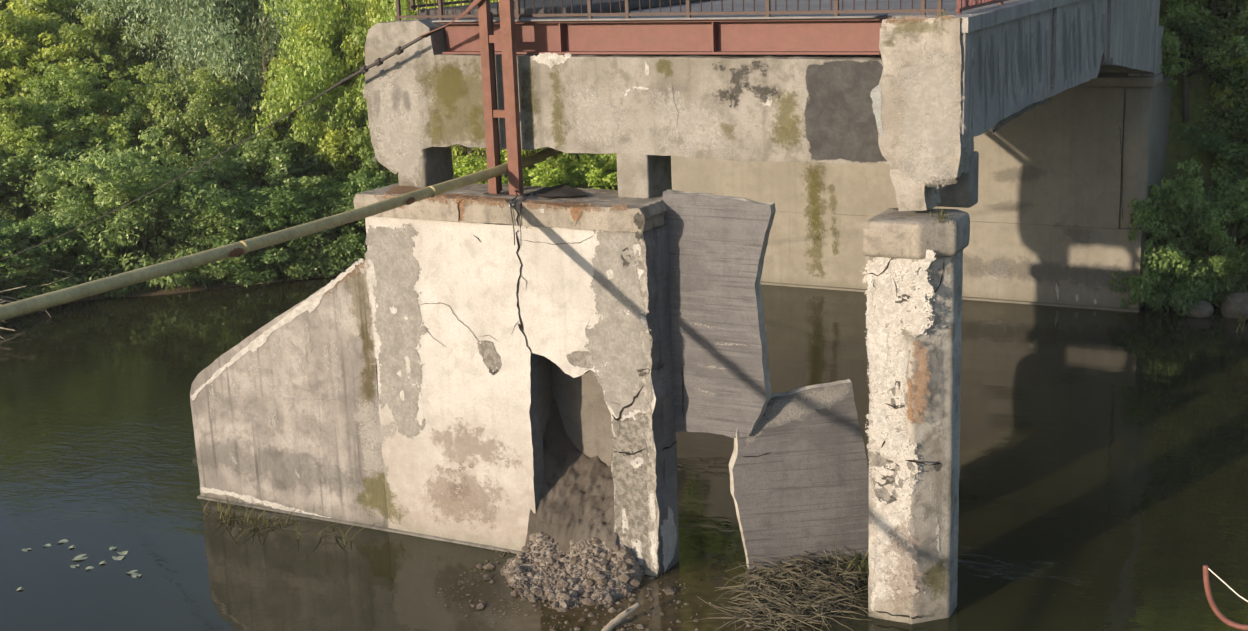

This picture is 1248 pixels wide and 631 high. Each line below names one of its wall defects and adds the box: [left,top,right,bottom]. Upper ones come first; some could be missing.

peeling [191,224,428,438]
crack [421,200,592,355]
peeling [566,212,677,572]
crack [612,372,684,455]
damp [810,171,819,243]
peeling [862,248,942,611]
rust [907,341,930,423]